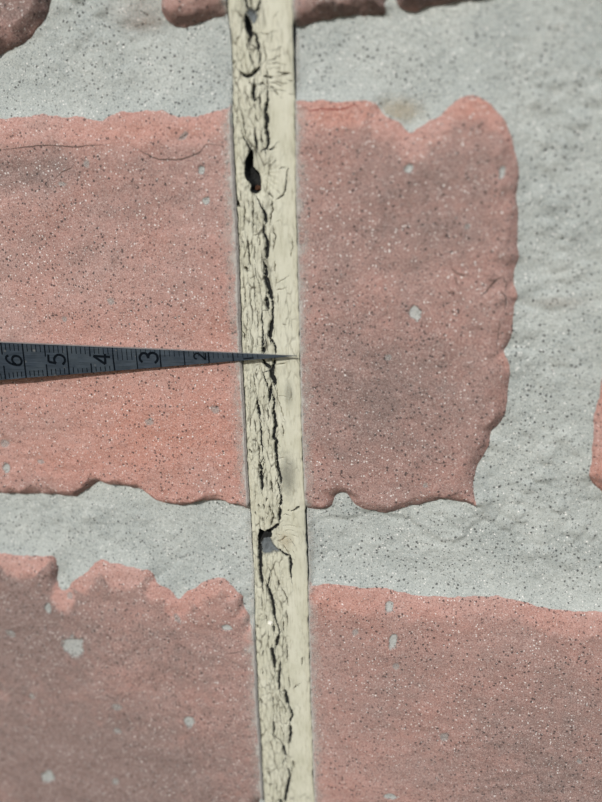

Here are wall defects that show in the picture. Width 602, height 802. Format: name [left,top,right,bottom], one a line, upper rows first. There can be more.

crack [132,0,362,802]